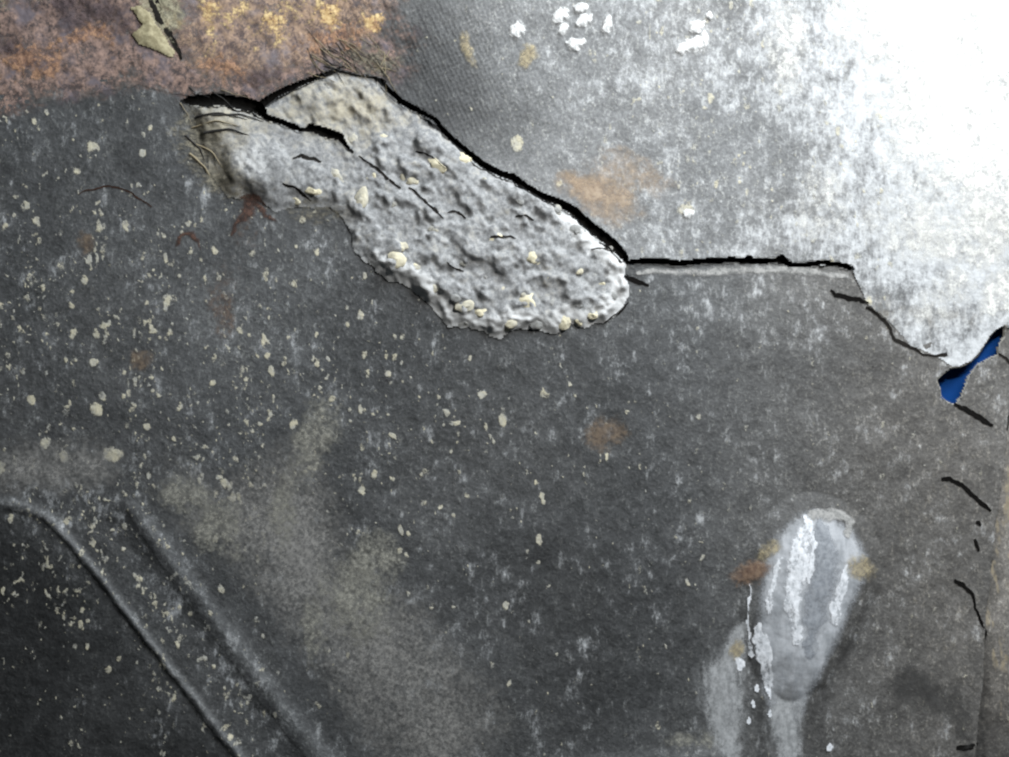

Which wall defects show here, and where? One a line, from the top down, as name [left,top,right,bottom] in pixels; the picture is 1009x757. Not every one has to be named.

crack [131,0,182,60]
corrosion [0,0,412,113]
crack [173,28,948,357]
crack [954,402,1009,430]
water stain [808,508,854,538]
crack [941,476,992,552]
crack [954,579,987,636]
water stain [676,622,747,757]
water stain [771,688,802,757]
crack [956,743,978,751]